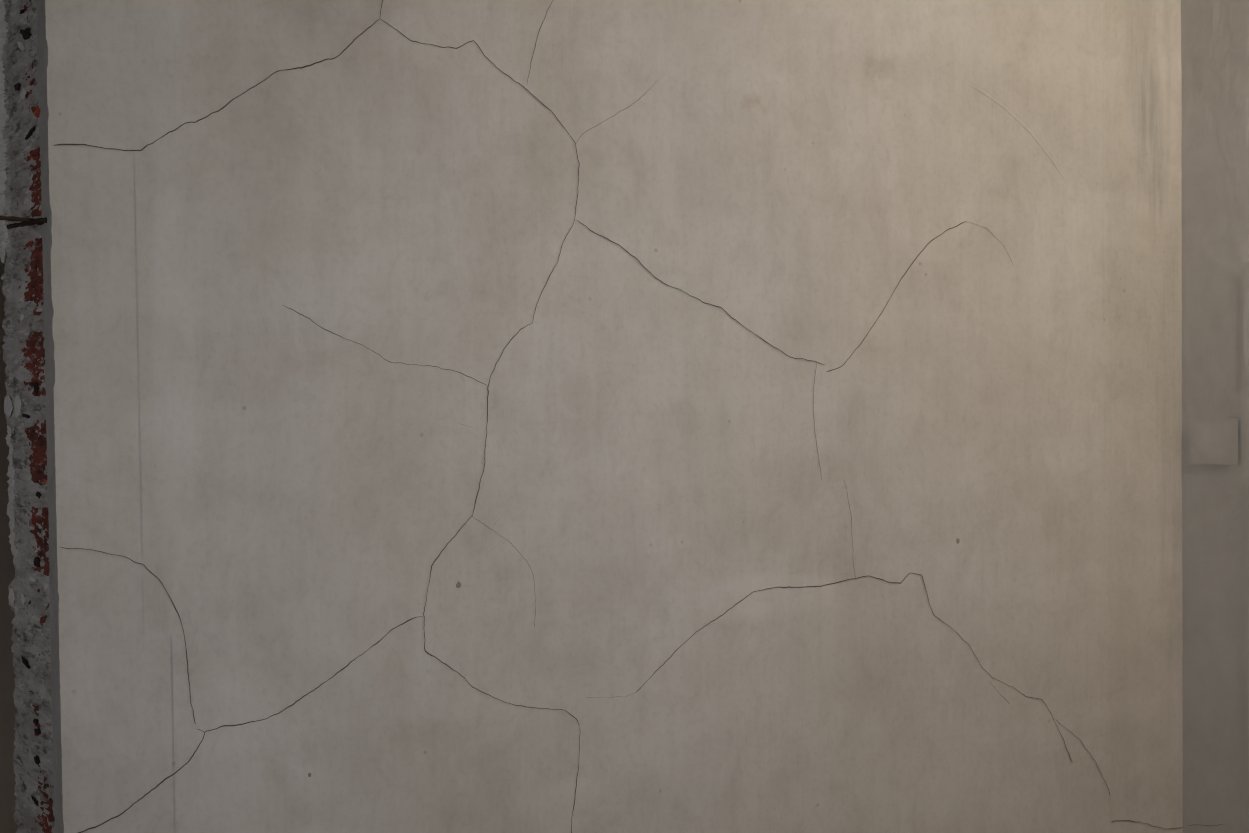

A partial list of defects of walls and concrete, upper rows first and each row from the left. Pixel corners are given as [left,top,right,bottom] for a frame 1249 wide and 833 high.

crack [56,0,1010,833]
crack [588,565,1110,794]
crack [1112,820,1222,829]